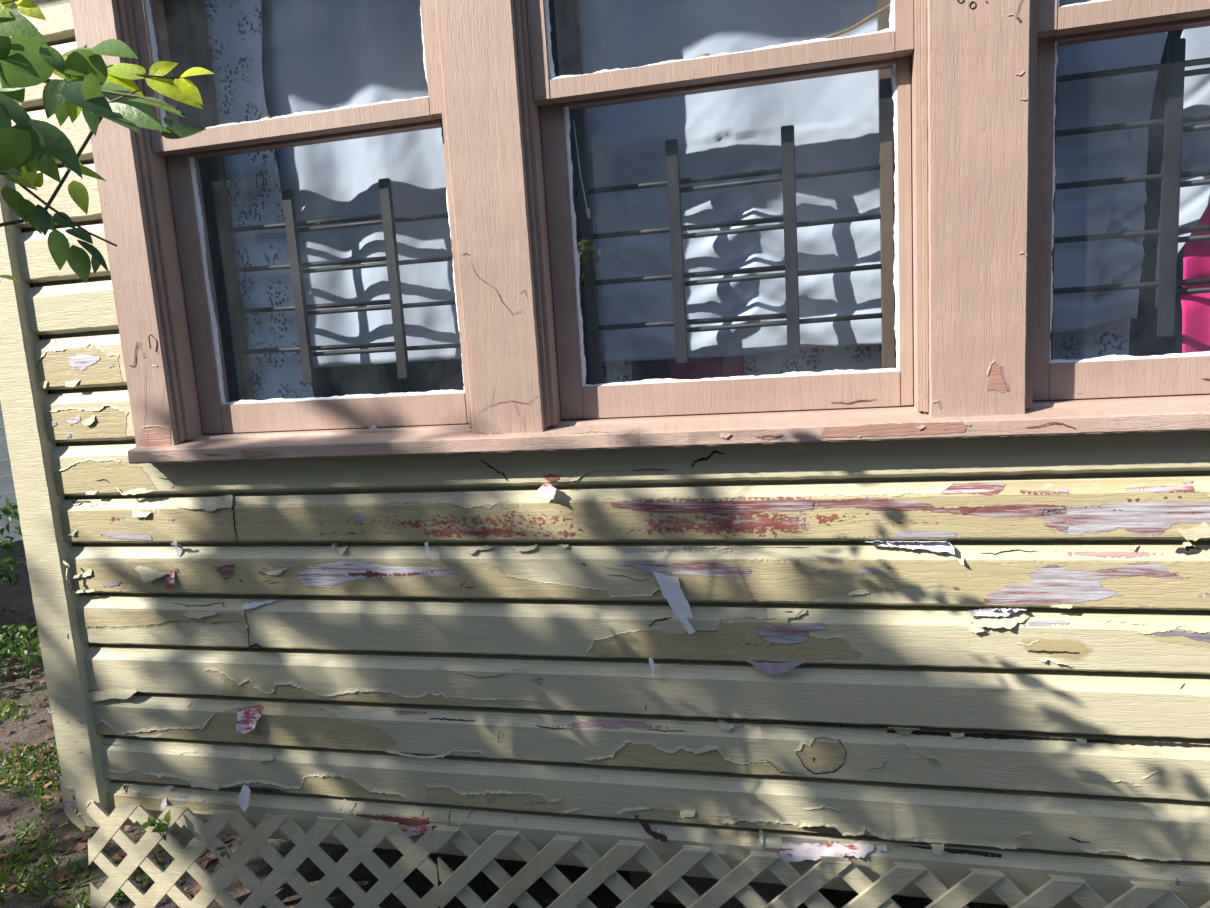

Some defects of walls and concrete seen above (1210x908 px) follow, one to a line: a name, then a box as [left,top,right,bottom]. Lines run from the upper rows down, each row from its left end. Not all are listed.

crack [462,253,526,315]
peeling [35,339,123,389]
peeling [985,359,1010,393]
peeling [43,403,171,447]
peeling [820,399,971,438]
peeling [52,458,1210,677]
peeling [67,666,546,762]
peeling [536,719,800,776]
spalling [714,718,1210,747]
peeling [59,776,85,831]
peeling [106,766,582,837]
peeling [614,804,1182,877]